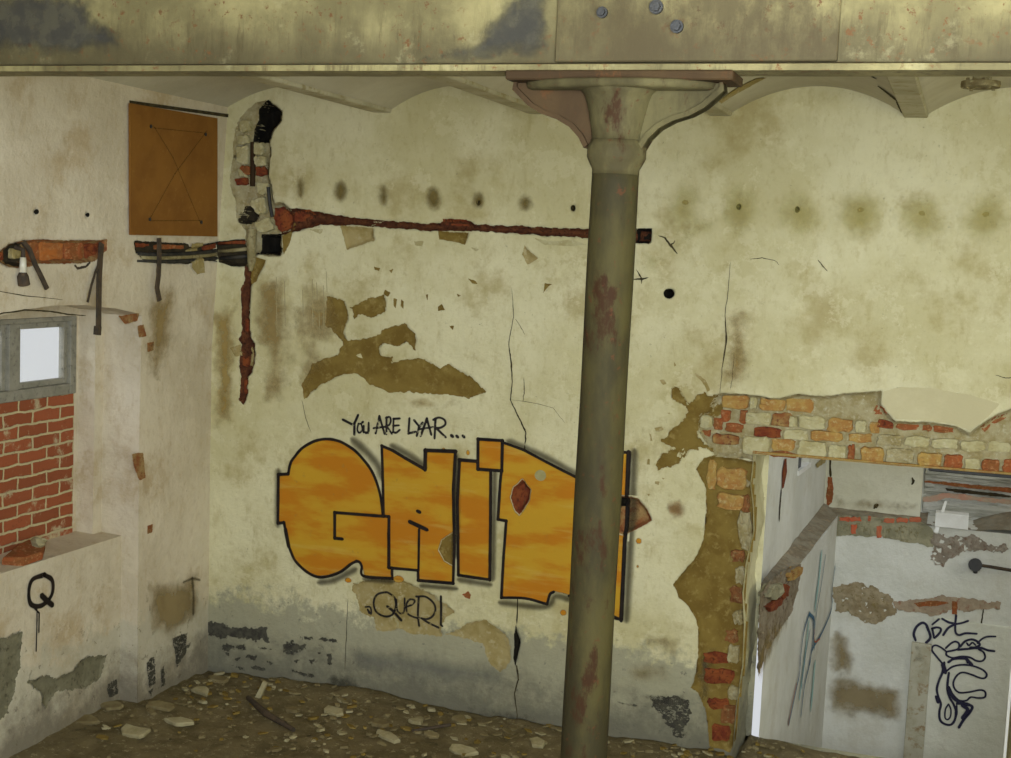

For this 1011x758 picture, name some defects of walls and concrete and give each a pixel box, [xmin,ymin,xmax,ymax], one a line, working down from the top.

spalling [0,239,107,270]
peeling [301,272,486,399]
crack [508,287,565,446]
spalling [619,494,652,535]
spalling [647,373,1011,752]
peeling [0,631,108,720]
crack [513,599,521,719]